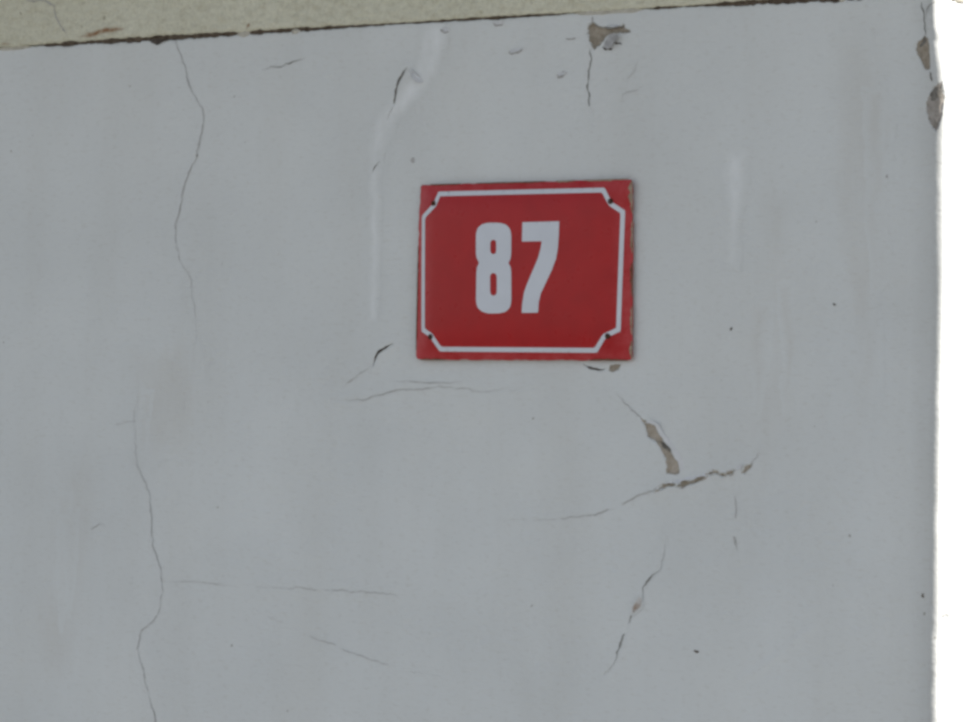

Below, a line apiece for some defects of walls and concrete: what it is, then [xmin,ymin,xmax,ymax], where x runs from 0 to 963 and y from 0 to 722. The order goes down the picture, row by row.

crack [585,49,593,104]
spalling [588,17,631,50]
spalling [916,36,945,130]
crack [174,44,204,357]
crack [346,344,392,384]
crack [585,364,620,372]
spalling [618,396,759,505]
crack [135,449,221,722]
crack [609,542,666,670]